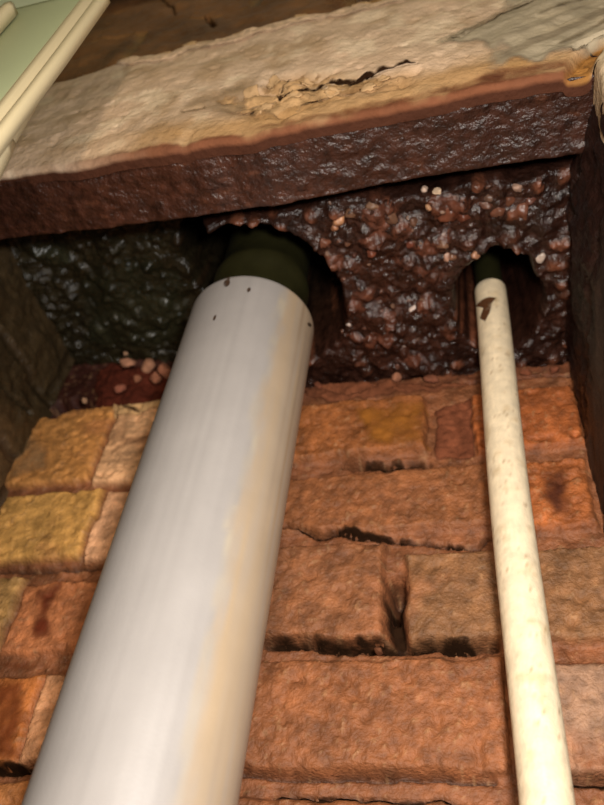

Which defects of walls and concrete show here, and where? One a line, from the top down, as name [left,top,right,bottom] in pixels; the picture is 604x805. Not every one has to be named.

crack [277,59,416,101]